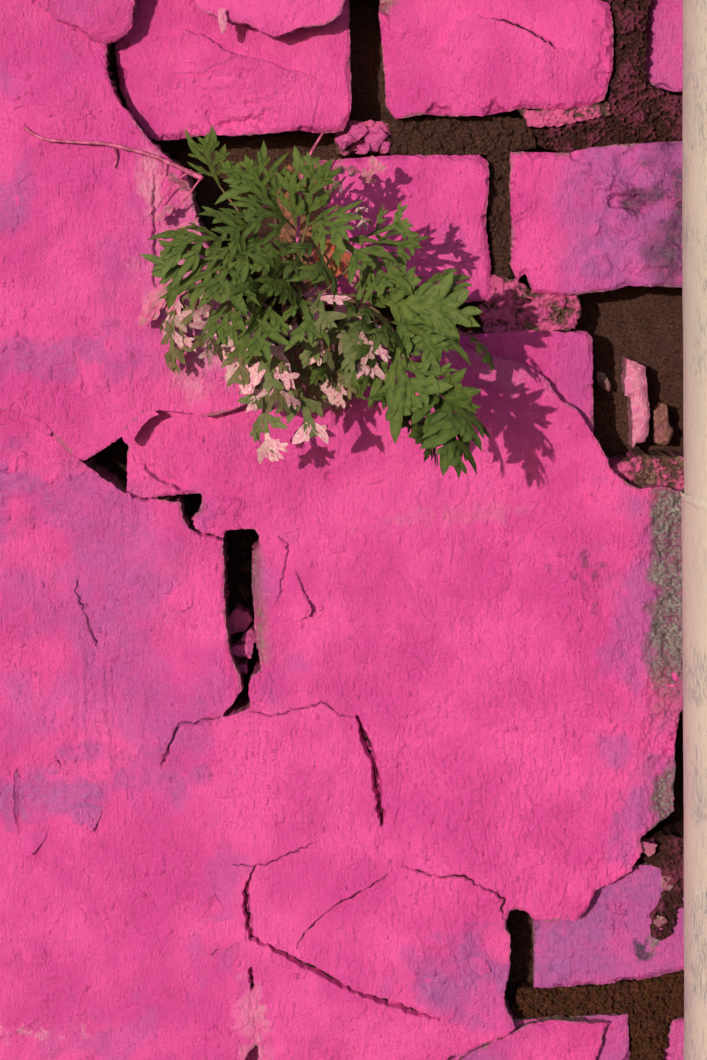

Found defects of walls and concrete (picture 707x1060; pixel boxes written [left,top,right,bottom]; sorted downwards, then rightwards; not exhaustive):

peeling [122,411,159,444]
crack [91,437,155,500]
crack [74,581,99,649]
crack [184,493,384,821]
crack [161,717,218,764]
crack [232,843,507,1012]